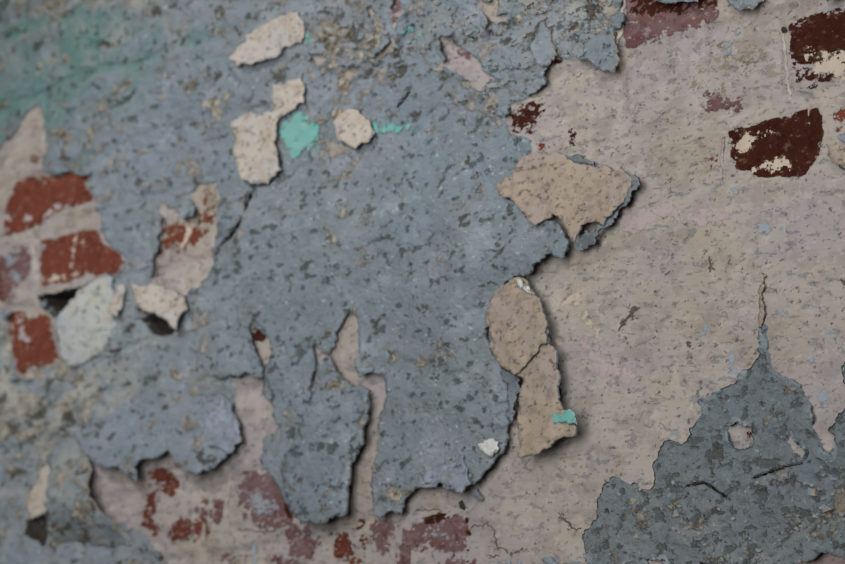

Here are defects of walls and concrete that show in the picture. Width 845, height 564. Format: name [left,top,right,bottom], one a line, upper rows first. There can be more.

peeling [228,0,410,82]
peeling [433,28,504,91]
peeling [333,109,376,150]
peeling [0,78,306,385]
peeling [472,0,845,564]
peeling [24,312,559,564]
crack [686,481,727,499]
crack [753,459,822,478]